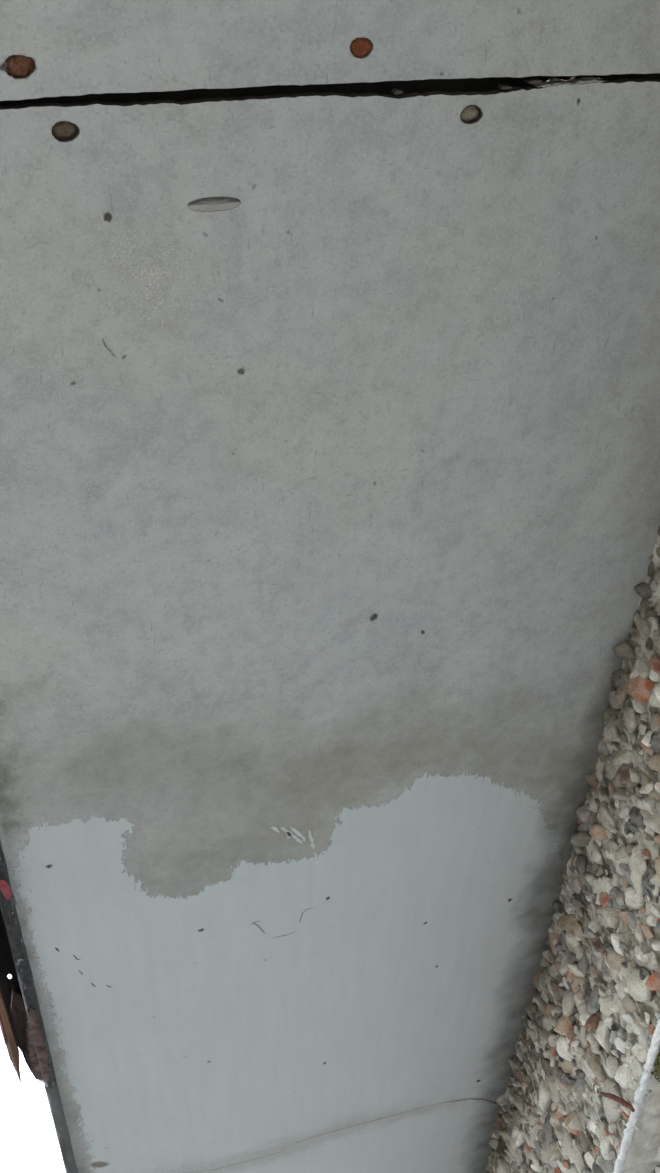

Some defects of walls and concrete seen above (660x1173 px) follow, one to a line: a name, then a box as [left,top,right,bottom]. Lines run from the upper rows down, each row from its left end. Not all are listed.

damp [482,820,579,1168]